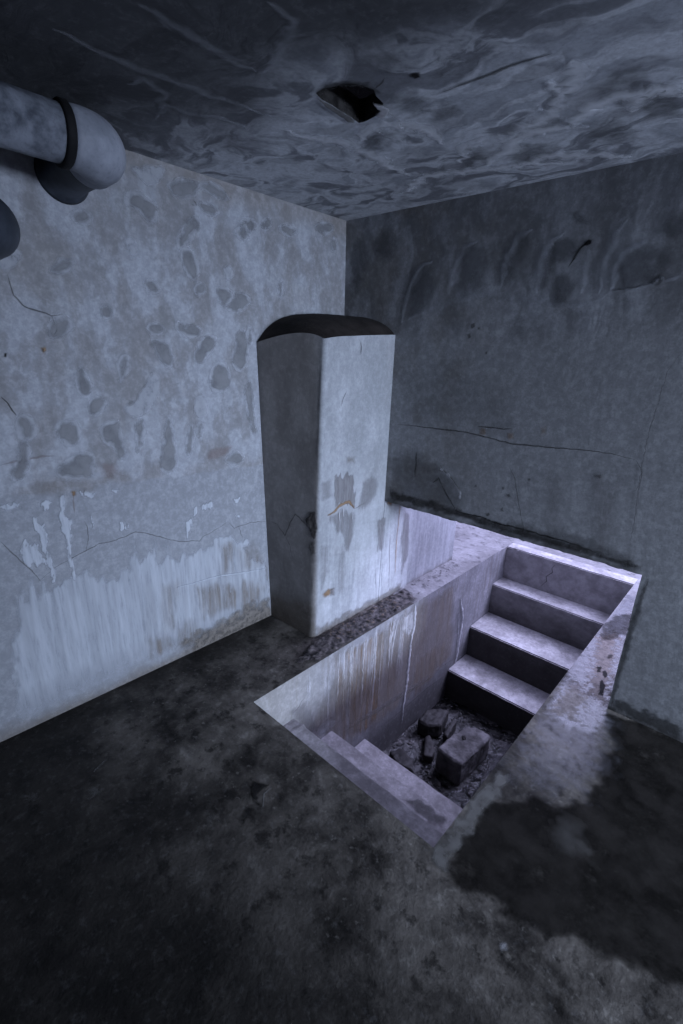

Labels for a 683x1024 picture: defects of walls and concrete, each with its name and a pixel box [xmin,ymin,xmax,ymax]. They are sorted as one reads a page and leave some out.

spalling [374,105,389,119]
crack [569,240,592,266]
crack [400,360,676,540]
peeling [12,495,269,704]
crack [4,515,303,579]
rust [328,501,364,550]
damp [382,605,417,721]
damp [449,715,683,983]